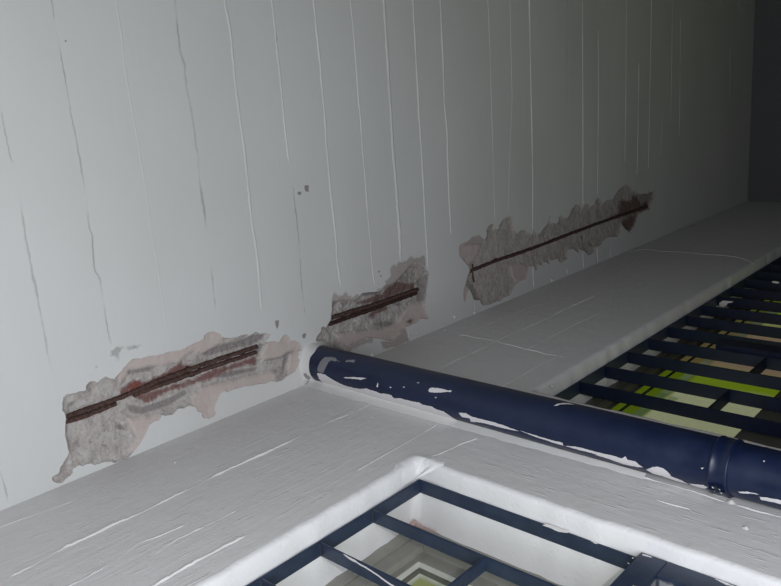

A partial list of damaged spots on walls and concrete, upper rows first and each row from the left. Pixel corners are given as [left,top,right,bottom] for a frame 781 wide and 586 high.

spalling [315,257,429,351]
spalling [459,185,655,305]
spalling [52,320,306,483]